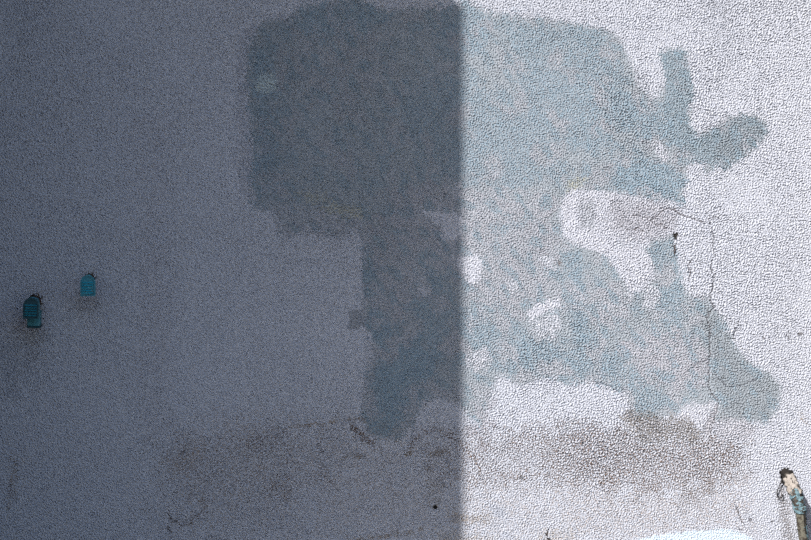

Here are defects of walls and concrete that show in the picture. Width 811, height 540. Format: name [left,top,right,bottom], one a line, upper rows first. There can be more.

leakage [698,0,754,94]
crack [620,208,761,433]